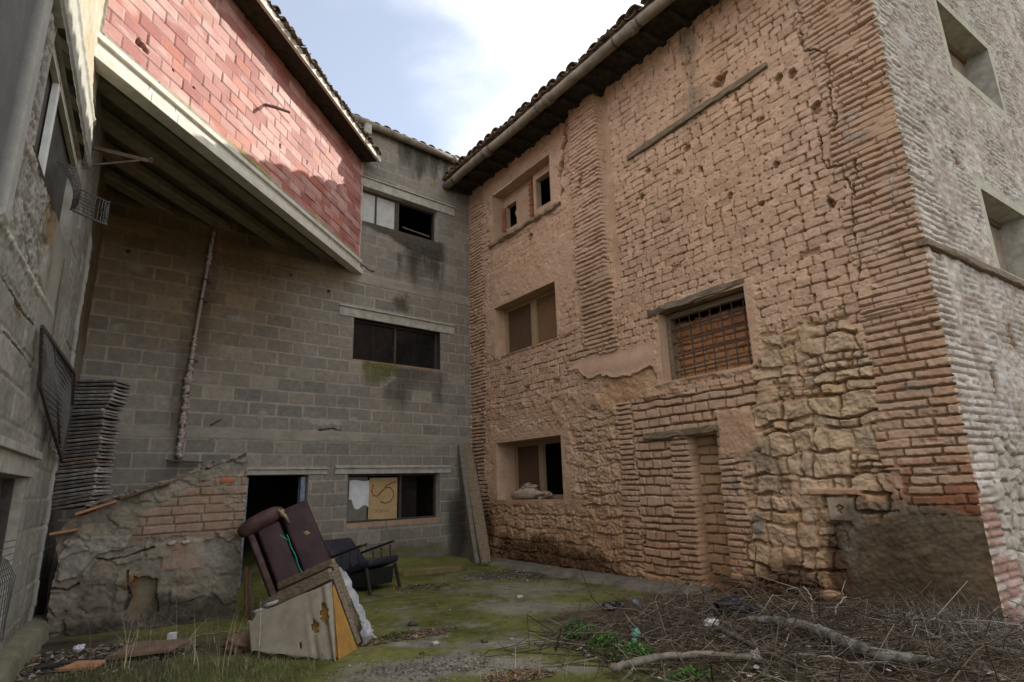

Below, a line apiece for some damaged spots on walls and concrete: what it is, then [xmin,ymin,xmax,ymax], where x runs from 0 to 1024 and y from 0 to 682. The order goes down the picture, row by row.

crack [796,0,862,281]
peeling [568,339,657,380]
spalling [126,576,159,618]